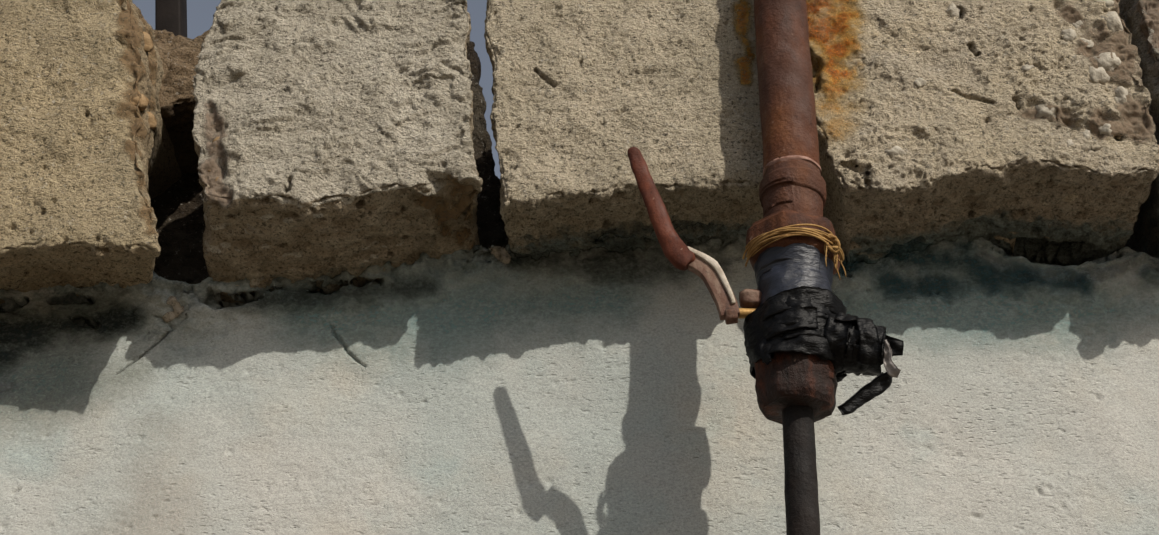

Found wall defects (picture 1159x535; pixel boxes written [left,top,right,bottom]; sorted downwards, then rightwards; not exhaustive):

corrosion [734,0,755,85]
corrosion [806,0,859,138]
water stain [229,226,690,338]
water stain [834,239,1131,332]
water stain [0,301,145,401]